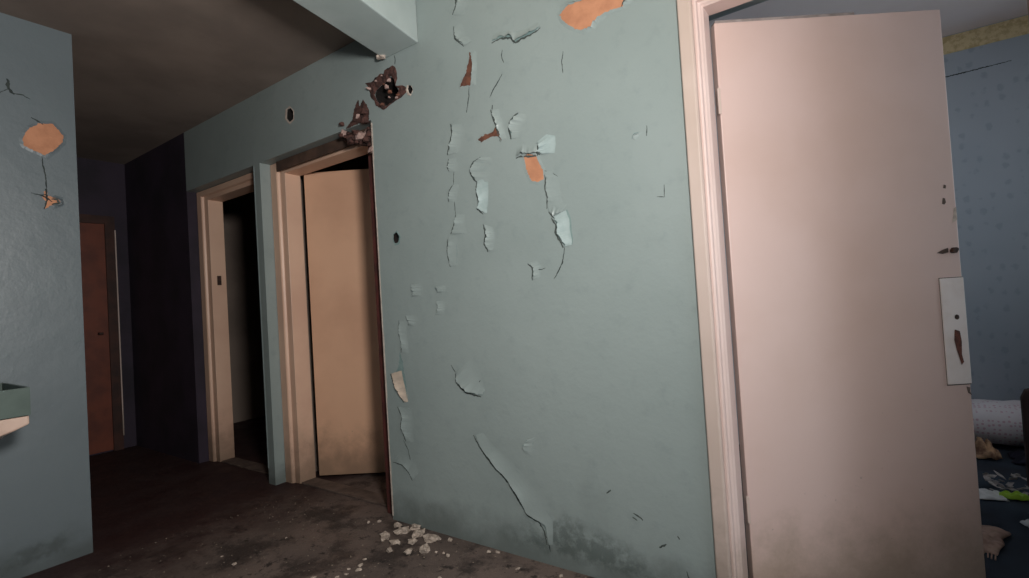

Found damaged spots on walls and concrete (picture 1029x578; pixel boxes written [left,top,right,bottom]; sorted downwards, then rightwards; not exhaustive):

peeling [557,0,633,35]
crack [0,79,29,99]
flaking render [365,54,413,110]
peeling [19,117,67,160]
peeling [447,0,573,280]
crack [33,156,47,195]
peeling [371,123,419,516]
peeling [473,433,556,552]